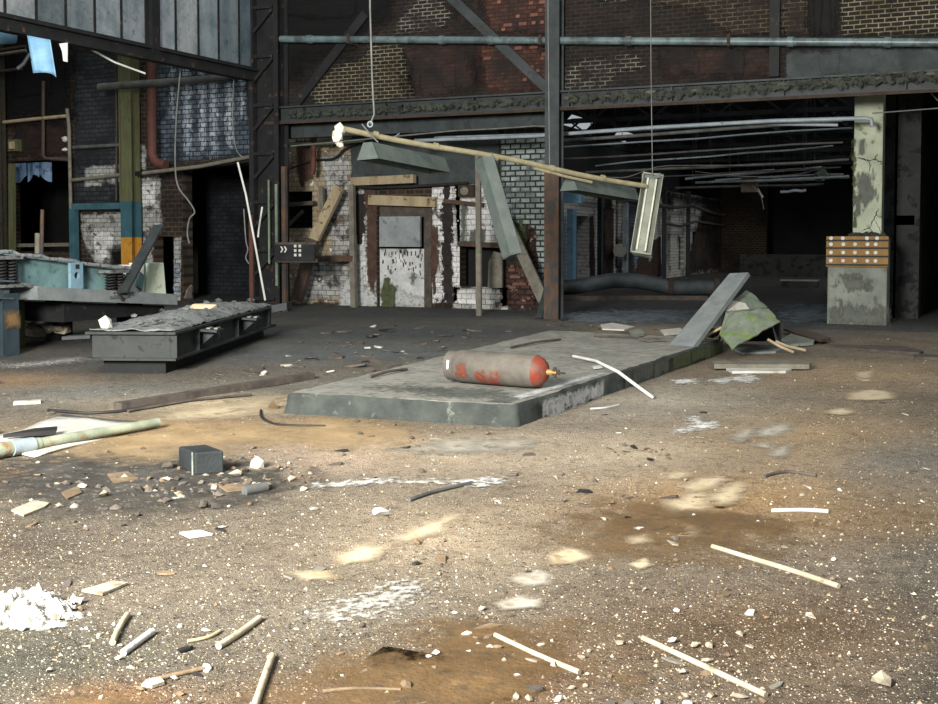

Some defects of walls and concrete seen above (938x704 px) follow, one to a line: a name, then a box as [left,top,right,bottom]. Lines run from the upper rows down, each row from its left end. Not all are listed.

spalling [472,0,545,94]
peeling [80,212,121,265]
peeling [141,175,162,262]
peeling [289,136,376,304]
peeling [363,164,394,175]
peeling [432,184,539,310]
peeling [500,133,545,287]